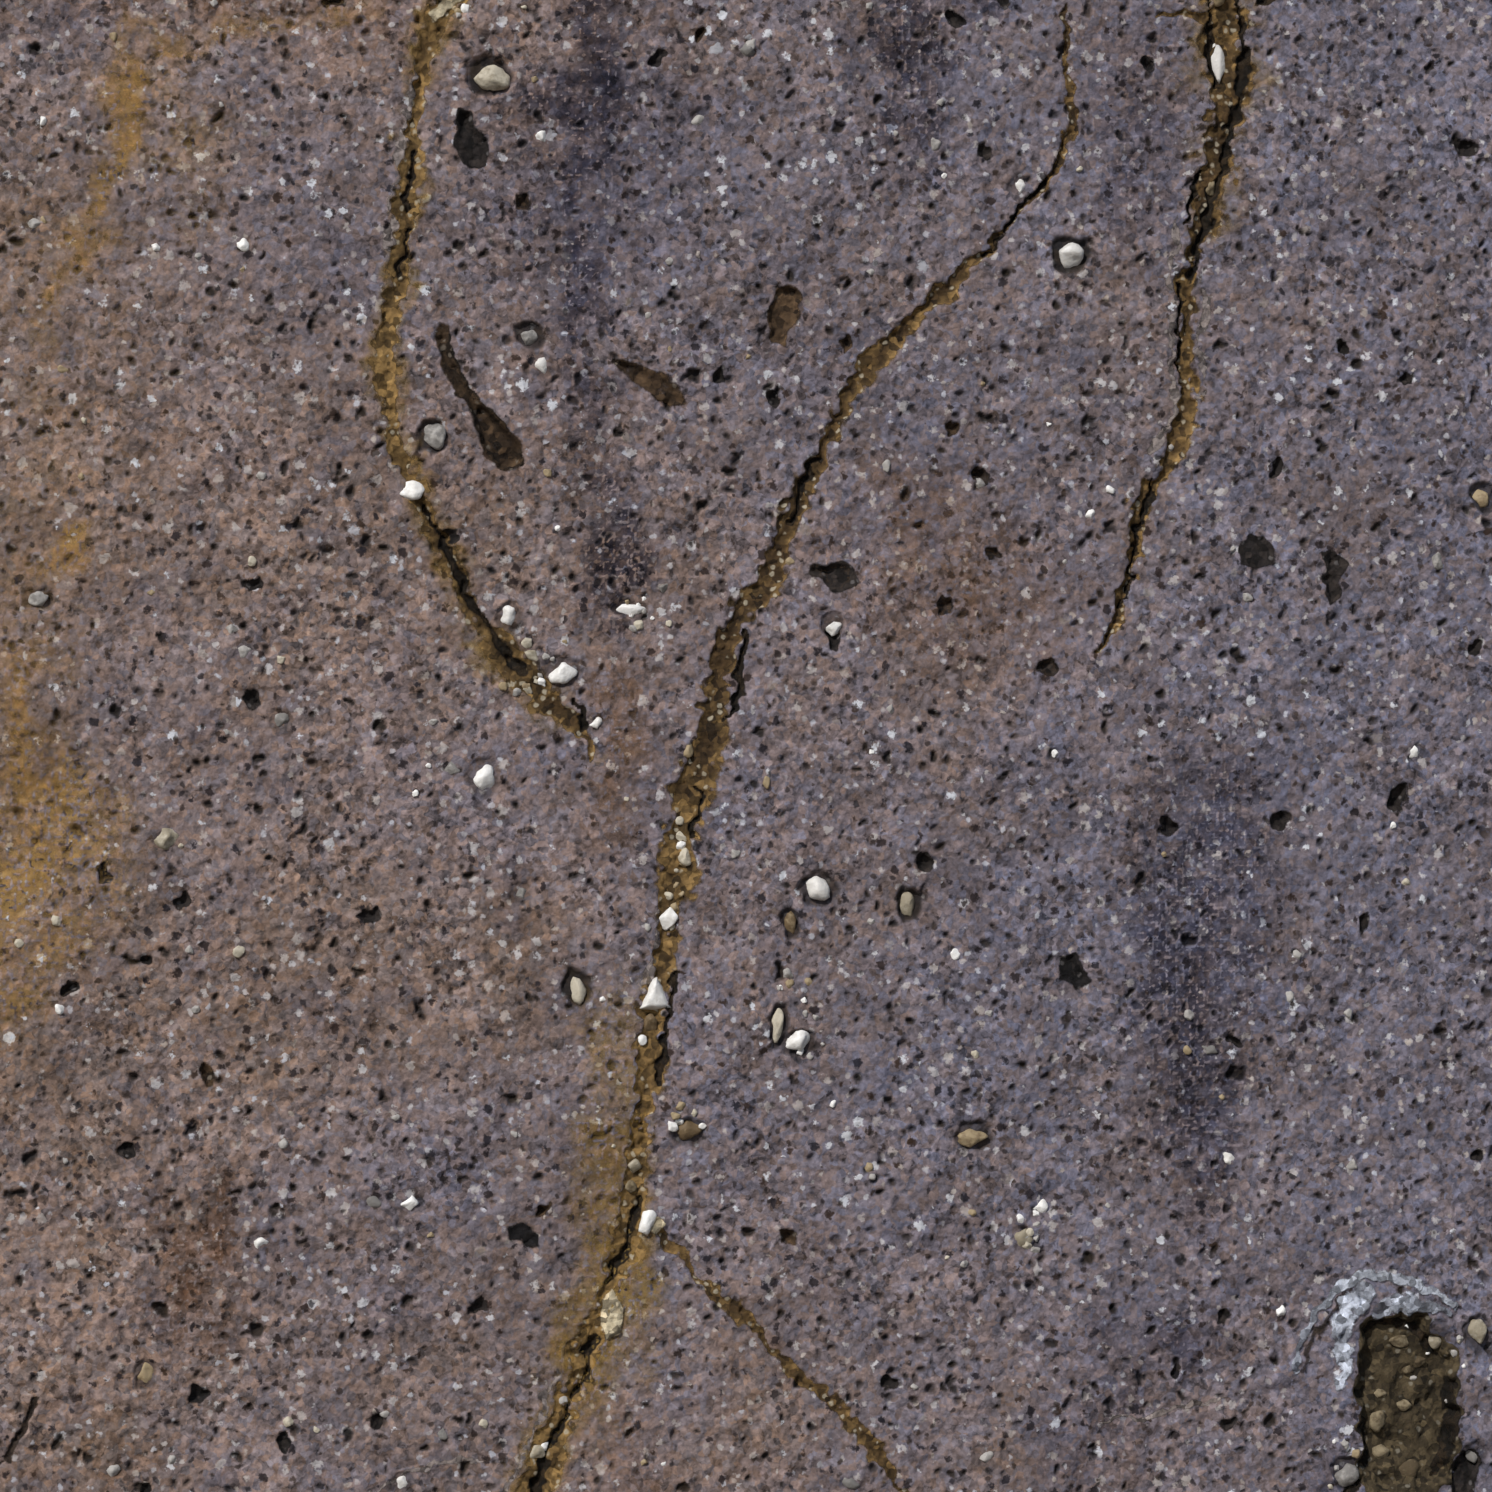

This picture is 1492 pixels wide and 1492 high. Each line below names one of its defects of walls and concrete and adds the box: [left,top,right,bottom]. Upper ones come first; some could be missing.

crack [367,0,595,762]
crack [1094,0,1257,654]
crack [501,3,1079,1492]
crack [0,1397,39,1464]
crack [1343,1475,1362,1492]
spalling [1291,1269,1482,1492]